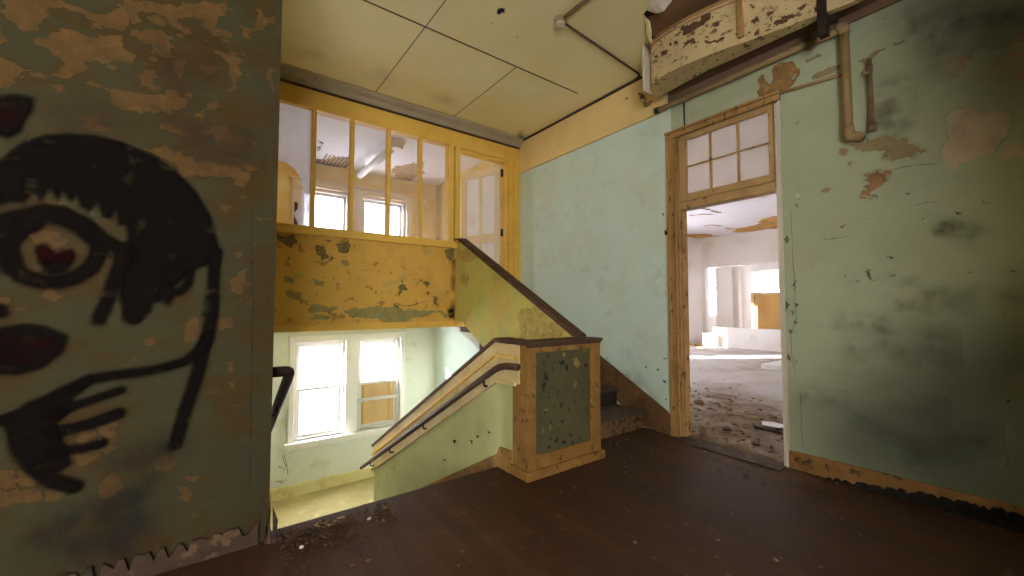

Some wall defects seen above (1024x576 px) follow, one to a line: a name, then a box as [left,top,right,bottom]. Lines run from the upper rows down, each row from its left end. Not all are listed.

peeling [654,13,725,58]
peeling [749,3,817,36]
peeling [0,0,276,137]
spalling [757,54,841,97]
peeling [143,146,259,187]
peeling [836,133,929,203]
peeling [276,234,298,248]
peeling [315,240,355,267]
peeling [281,276,448,322]